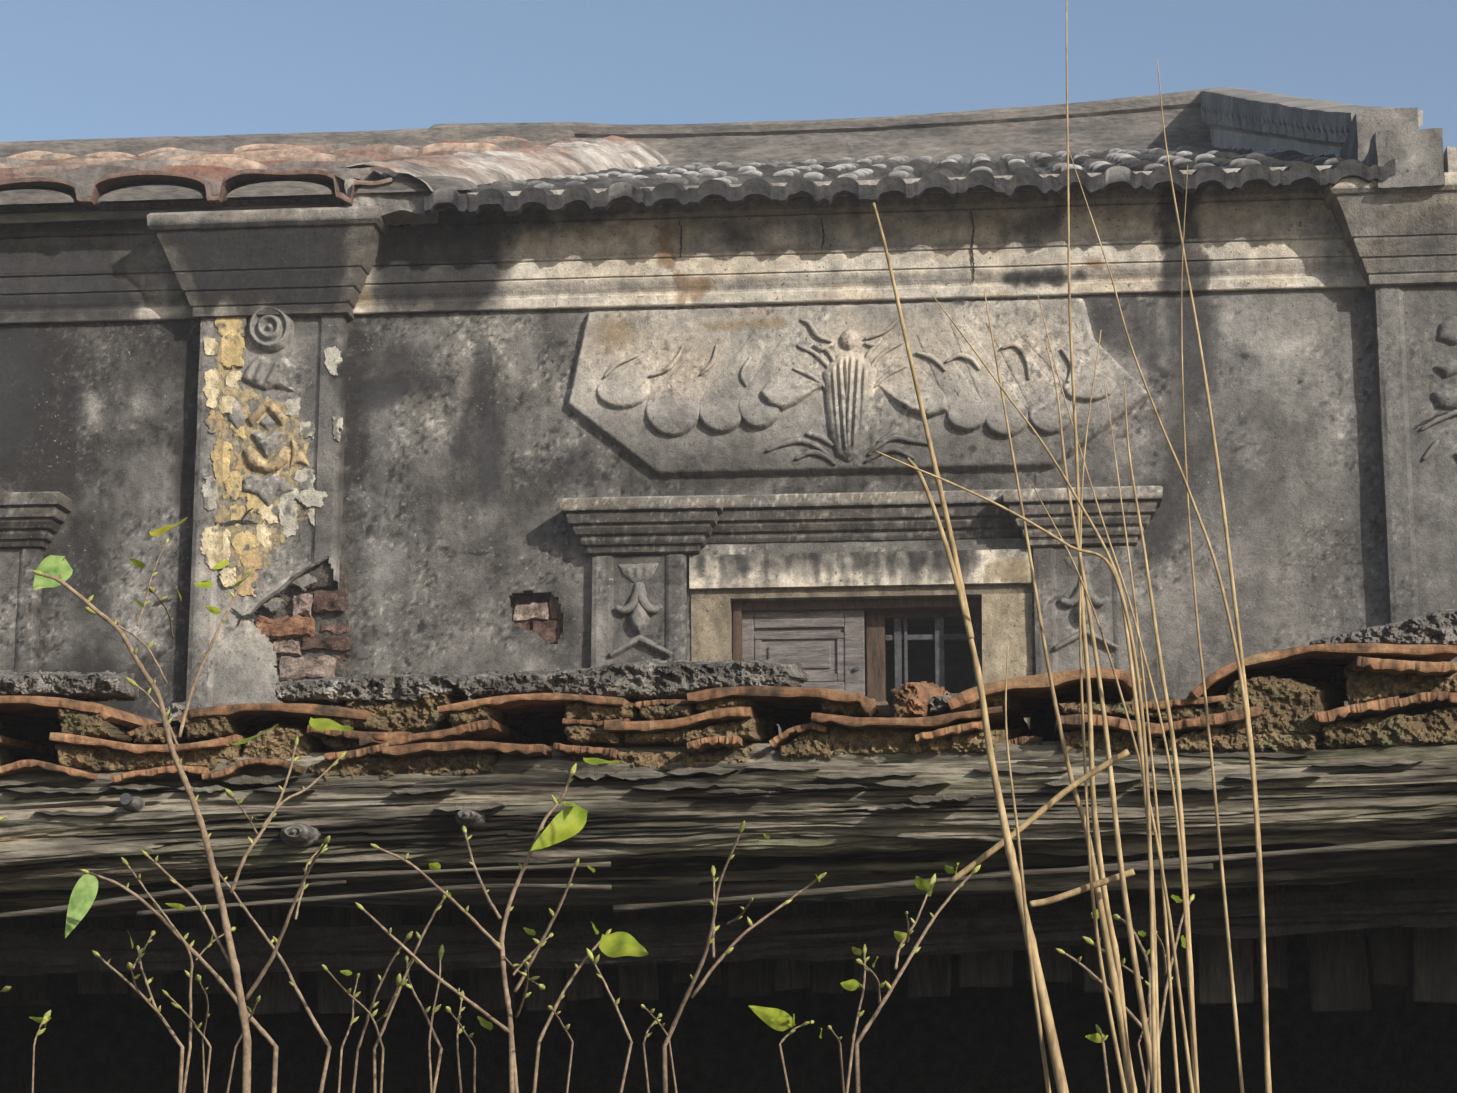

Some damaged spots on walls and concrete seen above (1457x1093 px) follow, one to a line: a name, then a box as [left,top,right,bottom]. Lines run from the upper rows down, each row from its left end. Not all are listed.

crack [968,211,976,284]
leakage [1005,268,1086,286]
leakage [1097,187,1213,398]
peeling [200,317,352,682]
flaking render [510,592,563,644]